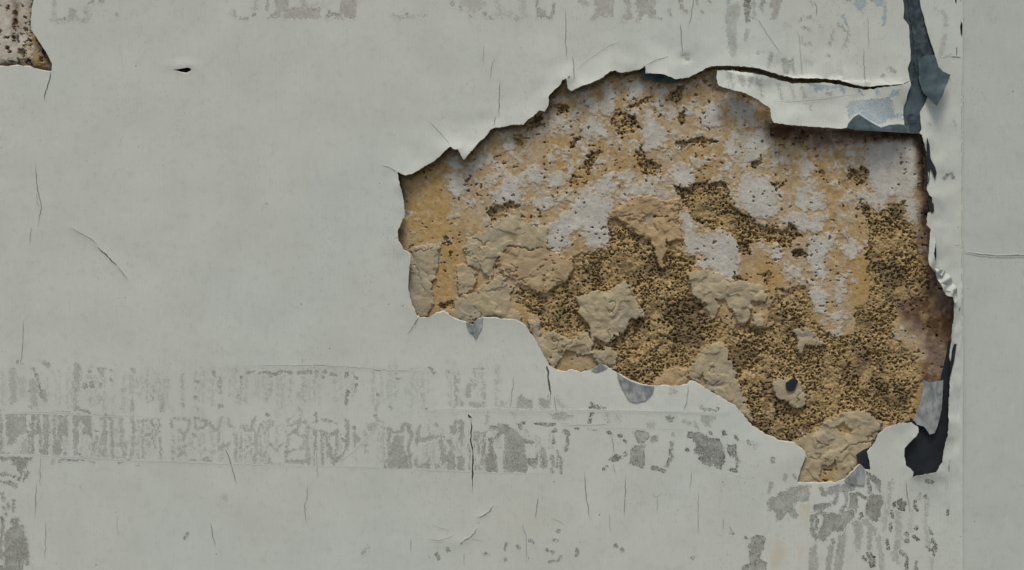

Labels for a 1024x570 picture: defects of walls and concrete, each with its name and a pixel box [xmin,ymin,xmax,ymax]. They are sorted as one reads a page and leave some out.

spalling [0,0,52,71]
crack [69,226,129,280]
spalling [397,0,964,570]
crack [409,413,494,565]